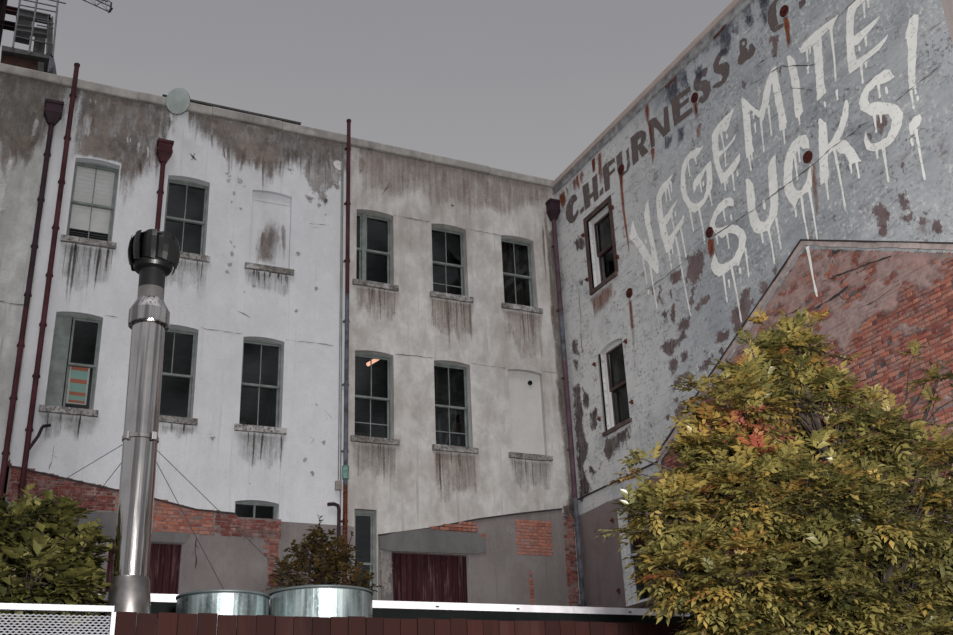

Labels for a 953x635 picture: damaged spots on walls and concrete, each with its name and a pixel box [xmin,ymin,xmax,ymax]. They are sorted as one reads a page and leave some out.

water stain [0,73,171,211]
water stain [189,112,347,181]
water stain [261,231,285,260]
rust [619,173,629,249]
flaking render [651,189,953,512]
flaking render [3,463,119,511]
flaking render [515,384,597,607]
flaking render [152,500,281,586]